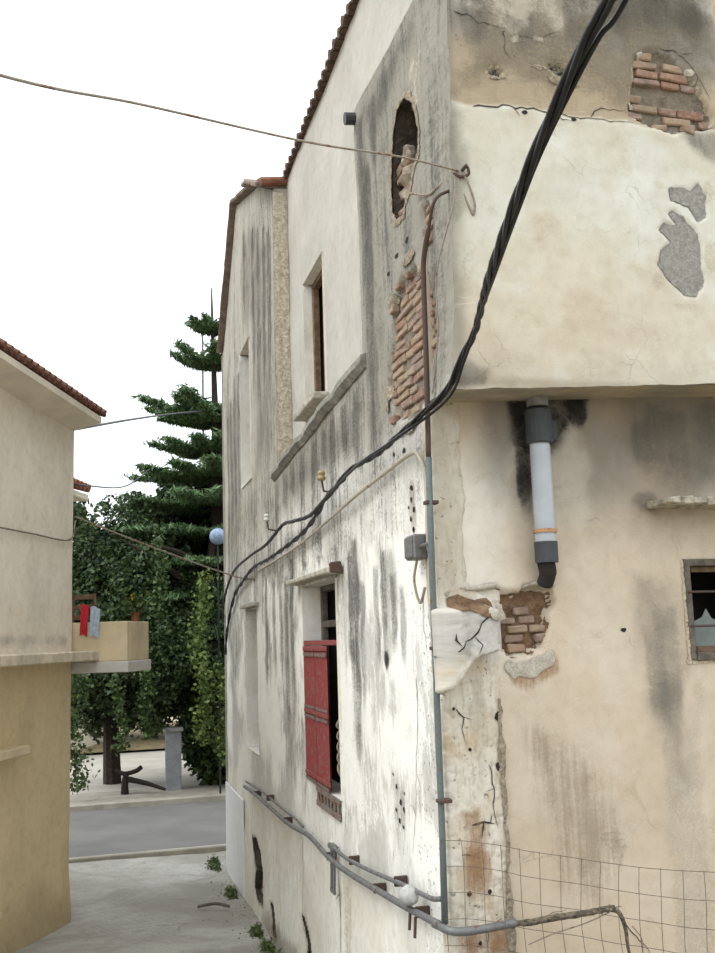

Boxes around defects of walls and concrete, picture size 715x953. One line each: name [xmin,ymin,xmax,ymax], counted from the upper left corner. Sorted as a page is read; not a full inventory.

spalling [389,90,425,227]
crack [455,11,567,59]
water stain [467,0,601,82]
crack [474,104,626,122]
water stain [579,0,707,101]
spalling [628,52,714,135]
peeling [657,183,714,296]
spalling [385,237,439,433]
water stain [508,401,532,503]
water stain [547,399,587,447]
spalling [446,579,556,679]
crack [466,765,499,857]